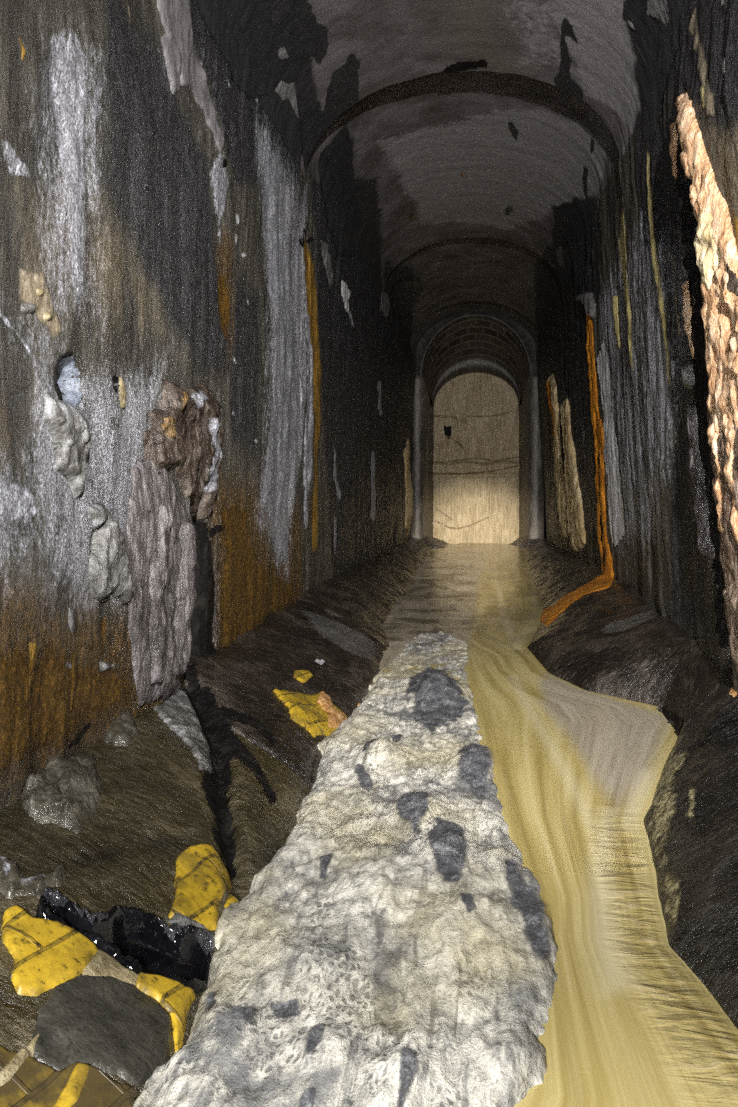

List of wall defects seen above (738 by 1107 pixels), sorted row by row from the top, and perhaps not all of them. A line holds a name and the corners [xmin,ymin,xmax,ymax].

efflorescence [49,33,85,311]
hole [112,375,126,409]
spalling [143,380,225,520]
rust [299,228,321,551]
rust [540,314,614,627]